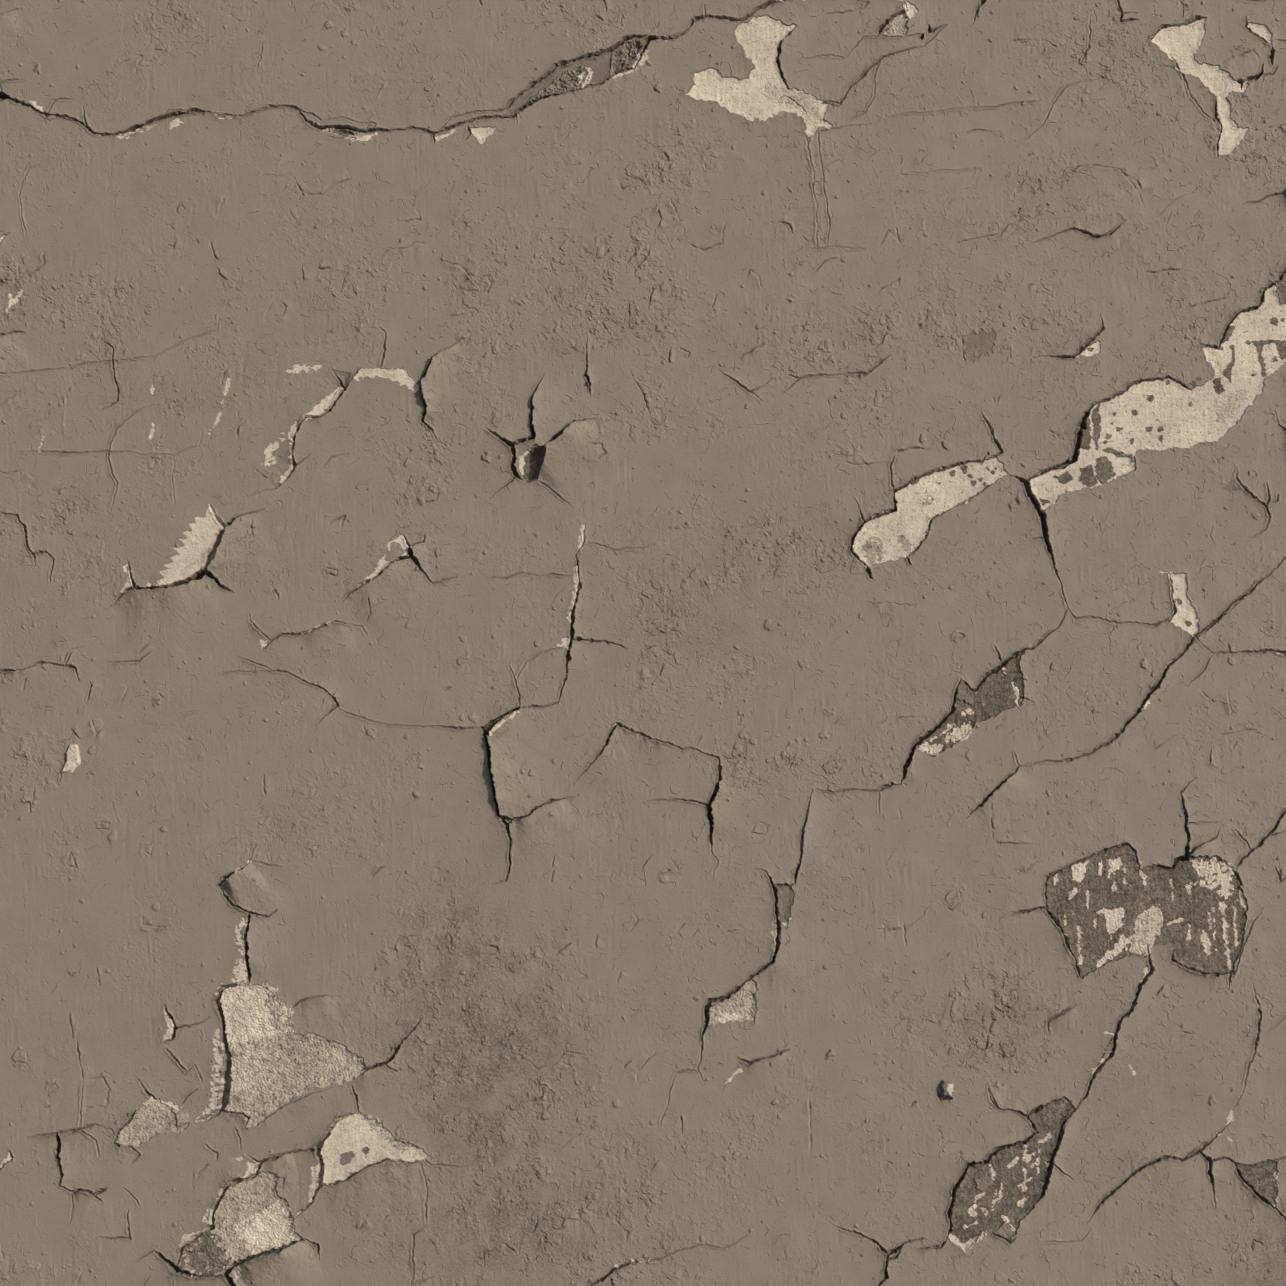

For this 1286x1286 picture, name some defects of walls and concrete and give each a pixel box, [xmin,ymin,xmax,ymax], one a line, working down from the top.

crack [0,0,806,144]
peeling [686,15,833,137]
peeling [850,413,1009,580]
crack [1009,475,1069,608]
peeling [1027,270,1286,513]
crack [217,524,744,885]
crack [966,557,1286,819]
peeling [27,844,462,1286]
crack [660,789,813,1130]
crack [828,1216,945,1286]
peeling [945,1082,1077,1253]
peeling [1012,777,1262,991]